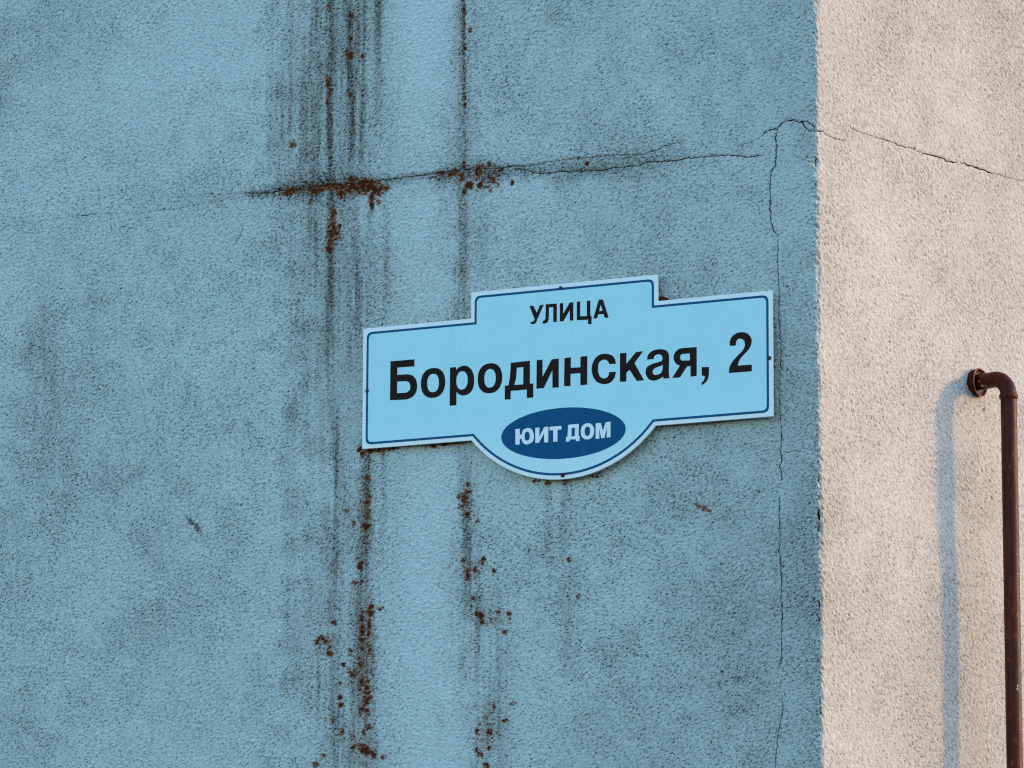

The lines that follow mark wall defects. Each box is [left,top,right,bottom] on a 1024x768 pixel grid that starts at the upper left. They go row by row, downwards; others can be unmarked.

damp [248,0,381,221]
damp [422,0,612,183]
rust [280,175,390,254]
rust [438,161,514,196]
damp [326,239,334,328]
crack [6,119,1019,662]
rust [343,476,372,586]
damp [356,449,371,689]
rust [456,482,479,523]
rust [471,596,512,634]
rust [313,604,384,764]
rust [475,701,516,768]